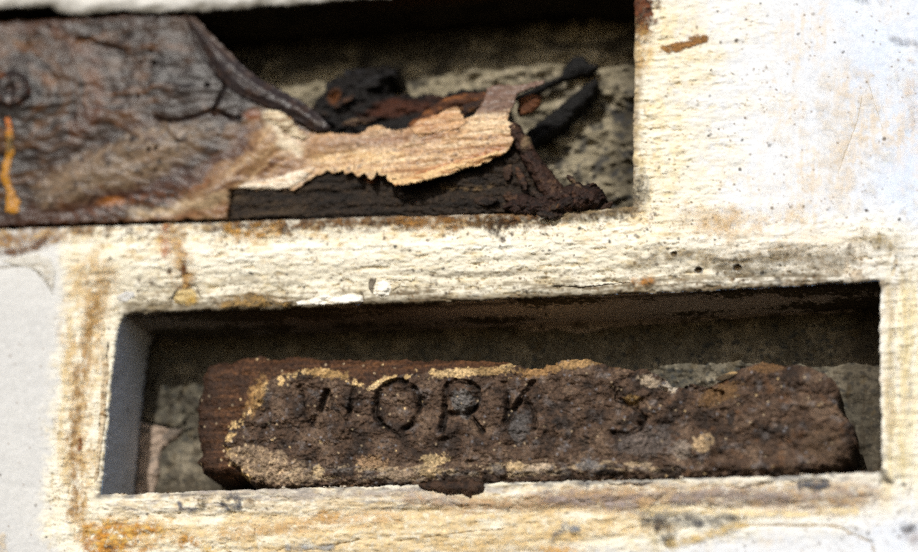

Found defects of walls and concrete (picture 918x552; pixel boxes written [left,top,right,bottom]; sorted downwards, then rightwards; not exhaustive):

corrosion [661,35,708,52]
leakage [797,480,830,490]
leakage [139,483,745,552]
corrosion [80,518,163,552]
crack [744,524,875,552]